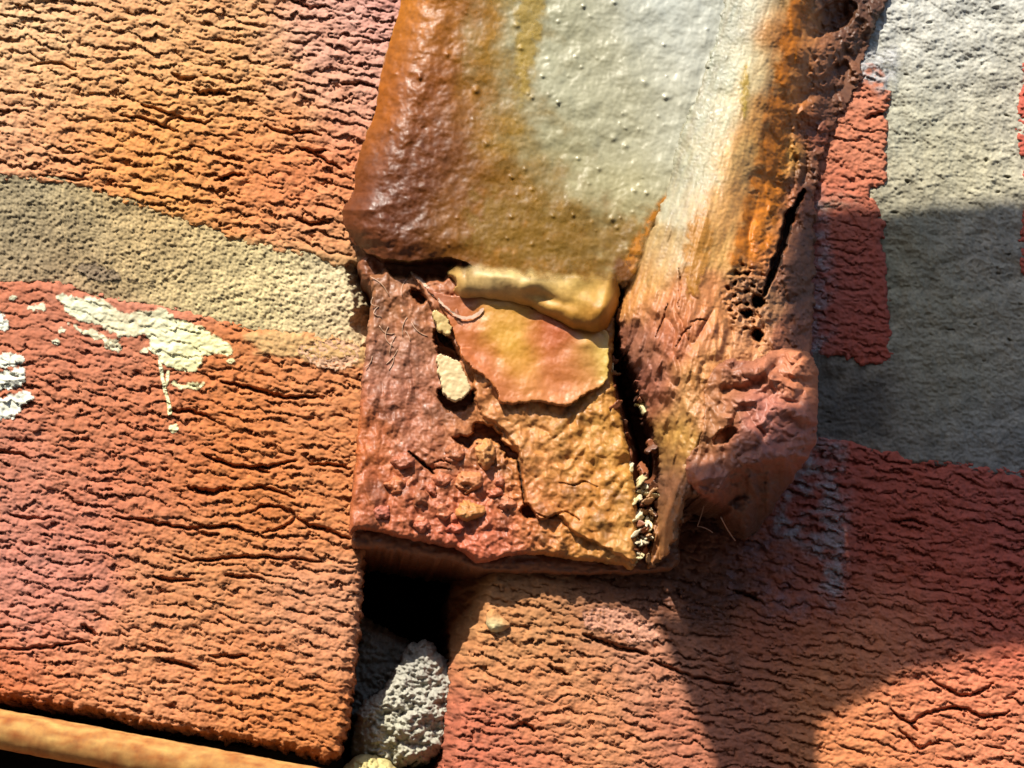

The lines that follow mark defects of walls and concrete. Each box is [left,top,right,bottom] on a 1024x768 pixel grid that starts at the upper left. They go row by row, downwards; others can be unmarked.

rust [342,0,666,280]
rust [730,0,809,265]
rust [683,210,713,295]
crack [763,191,805,295]
peeling [410,271,646,439]
peeling [629,439,660,567]